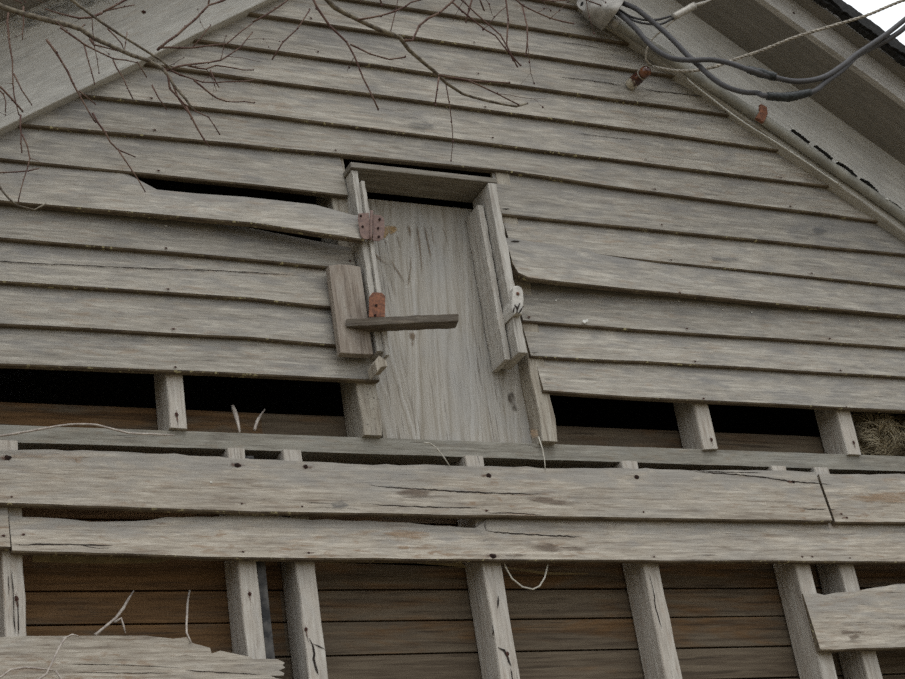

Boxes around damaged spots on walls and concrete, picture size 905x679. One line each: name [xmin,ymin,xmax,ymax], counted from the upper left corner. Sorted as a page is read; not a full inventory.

peeling [791,128,902,209]